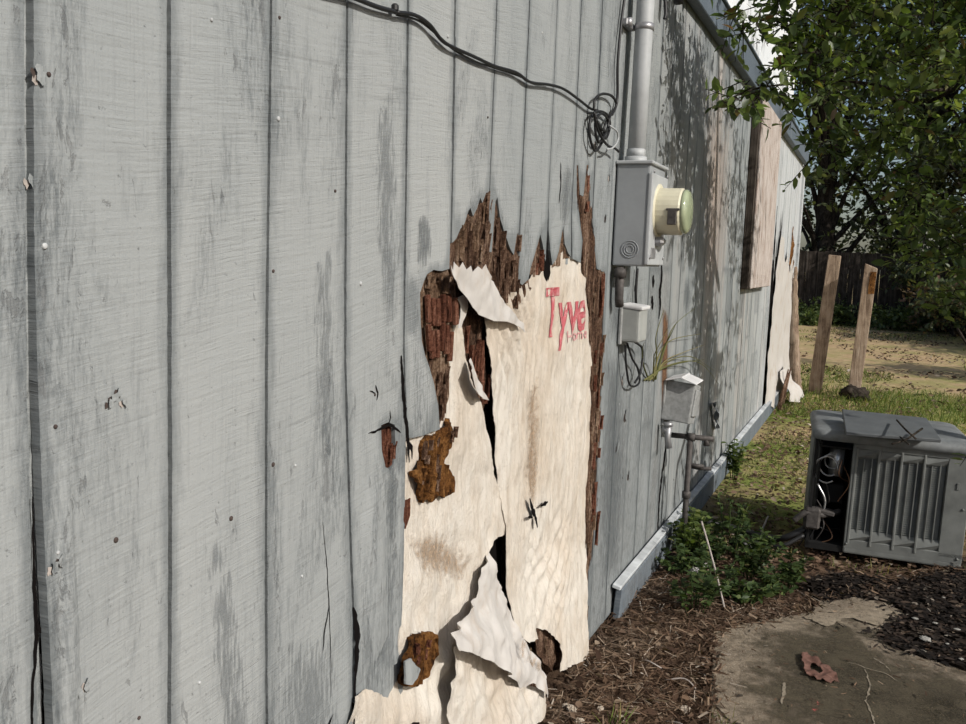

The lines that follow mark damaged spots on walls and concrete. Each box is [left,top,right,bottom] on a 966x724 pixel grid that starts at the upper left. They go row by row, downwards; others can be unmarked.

peeling [454,191,522,309]
peeling [535,250,545,275]
peeling [424,275,491,421]
peeling [385,423,398,467]
peeling [421,426,459,499]
crack [31,496,45,724]
crack [323,527,331,650]
crack [329,607,361,724]
peeling [404,640,432,685]